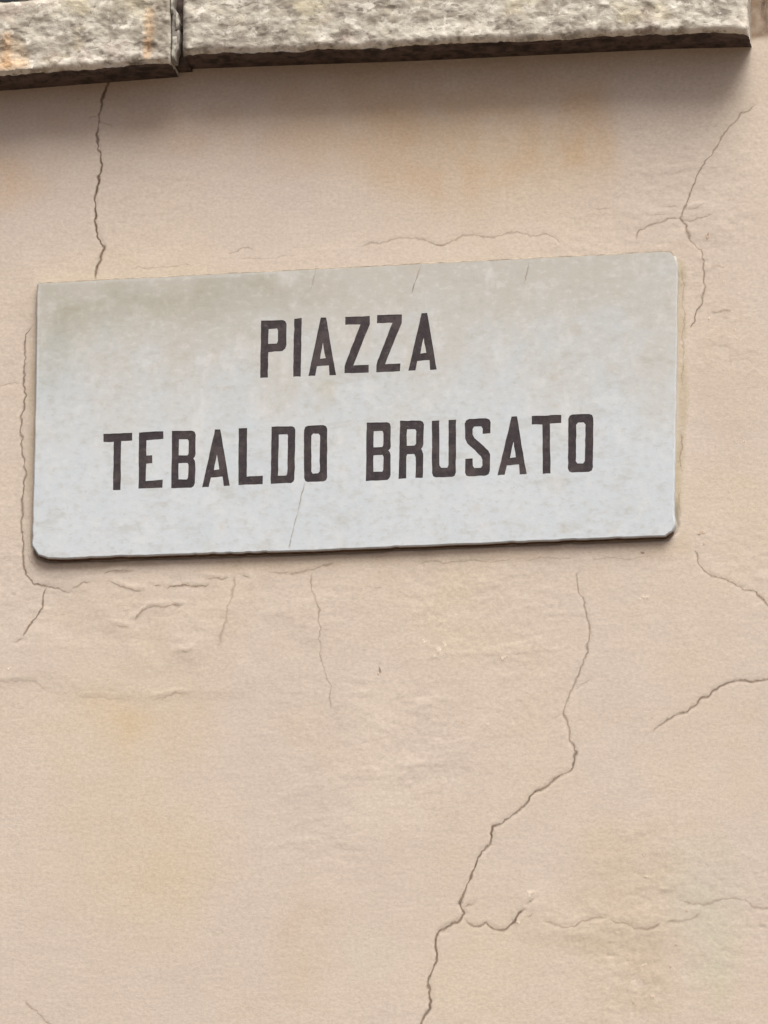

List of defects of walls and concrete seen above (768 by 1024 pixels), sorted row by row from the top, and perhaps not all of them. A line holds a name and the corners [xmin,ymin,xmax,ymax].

crack [94,83,109,276]
crack [680,132,725,325]
crack [20,330,60,634]
crack [661,679,768,725]
crack [420,744,577,1024]